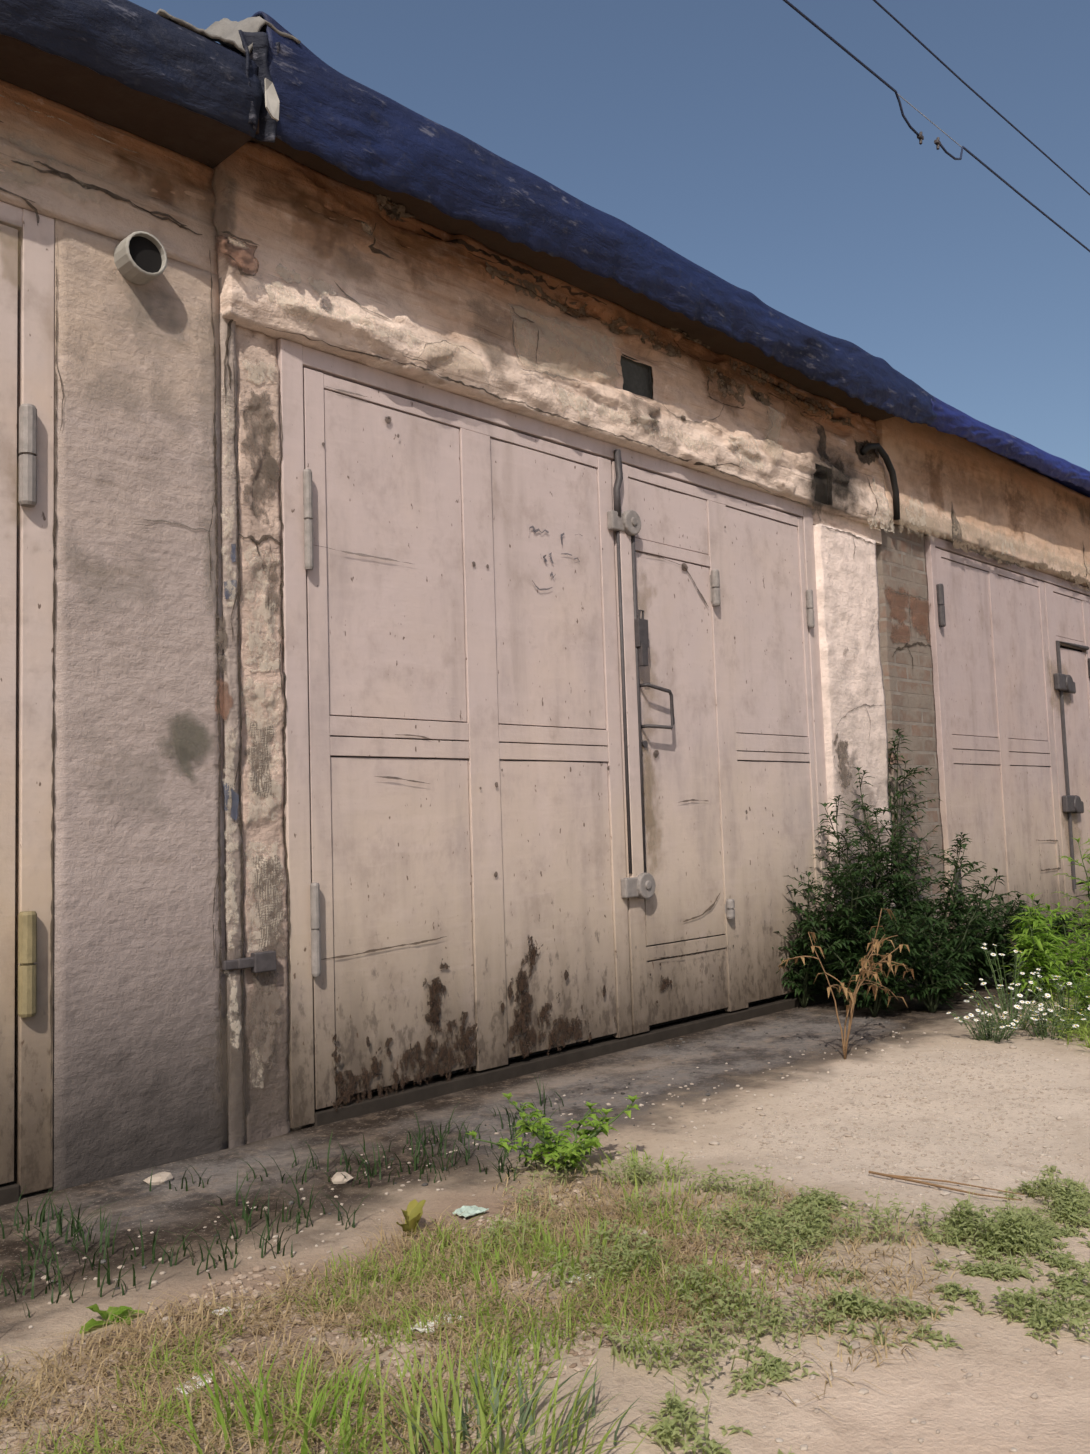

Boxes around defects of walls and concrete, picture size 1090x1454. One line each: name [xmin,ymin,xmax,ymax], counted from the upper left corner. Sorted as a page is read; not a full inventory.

water stain [812,426,849,516]
peeling [215,360,287,958]
crack [0,160,875,1138]
spalling [885,587,931,643]
water stain [171,715,208,778]
crack [837,704,883,737]
peeling [225,970,264,1088]
corrosion [321,936,447,960]
corrosion [326,958,480,1112]
corrosion [500,936,592,1058]